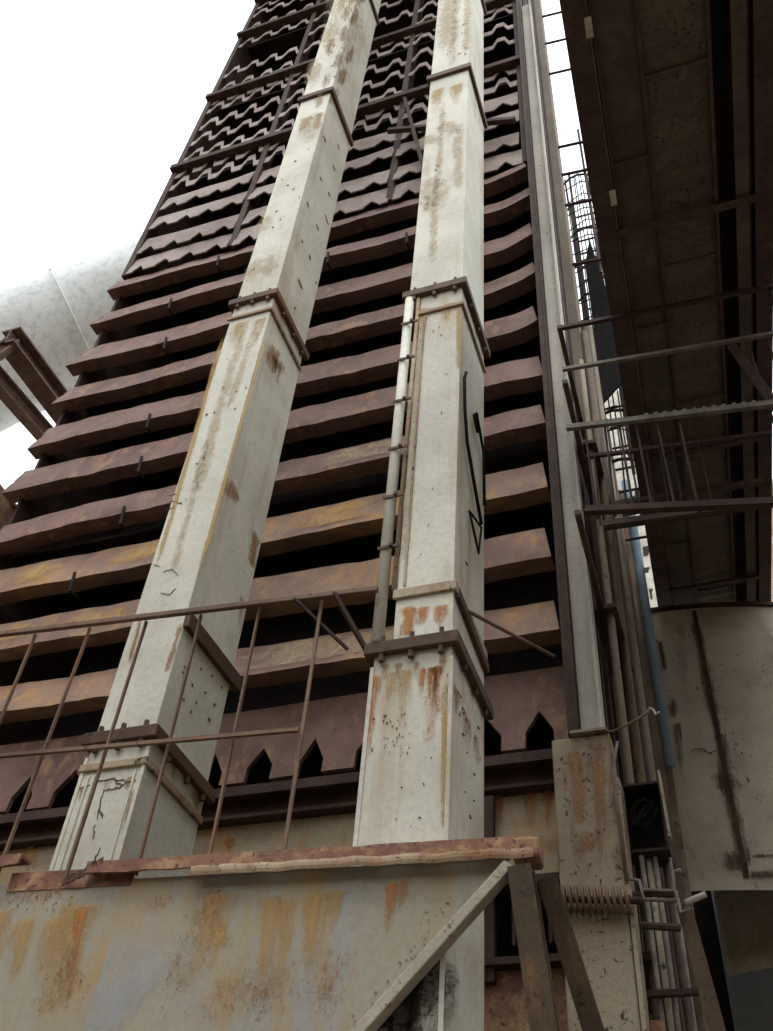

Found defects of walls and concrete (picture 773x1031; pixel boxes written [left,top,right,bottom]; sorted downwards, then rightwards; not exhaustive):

rust [400,605,447,635]
rust [369,658,478,825]
crack [79,777,136,861]
rust [194,890,349,1022]